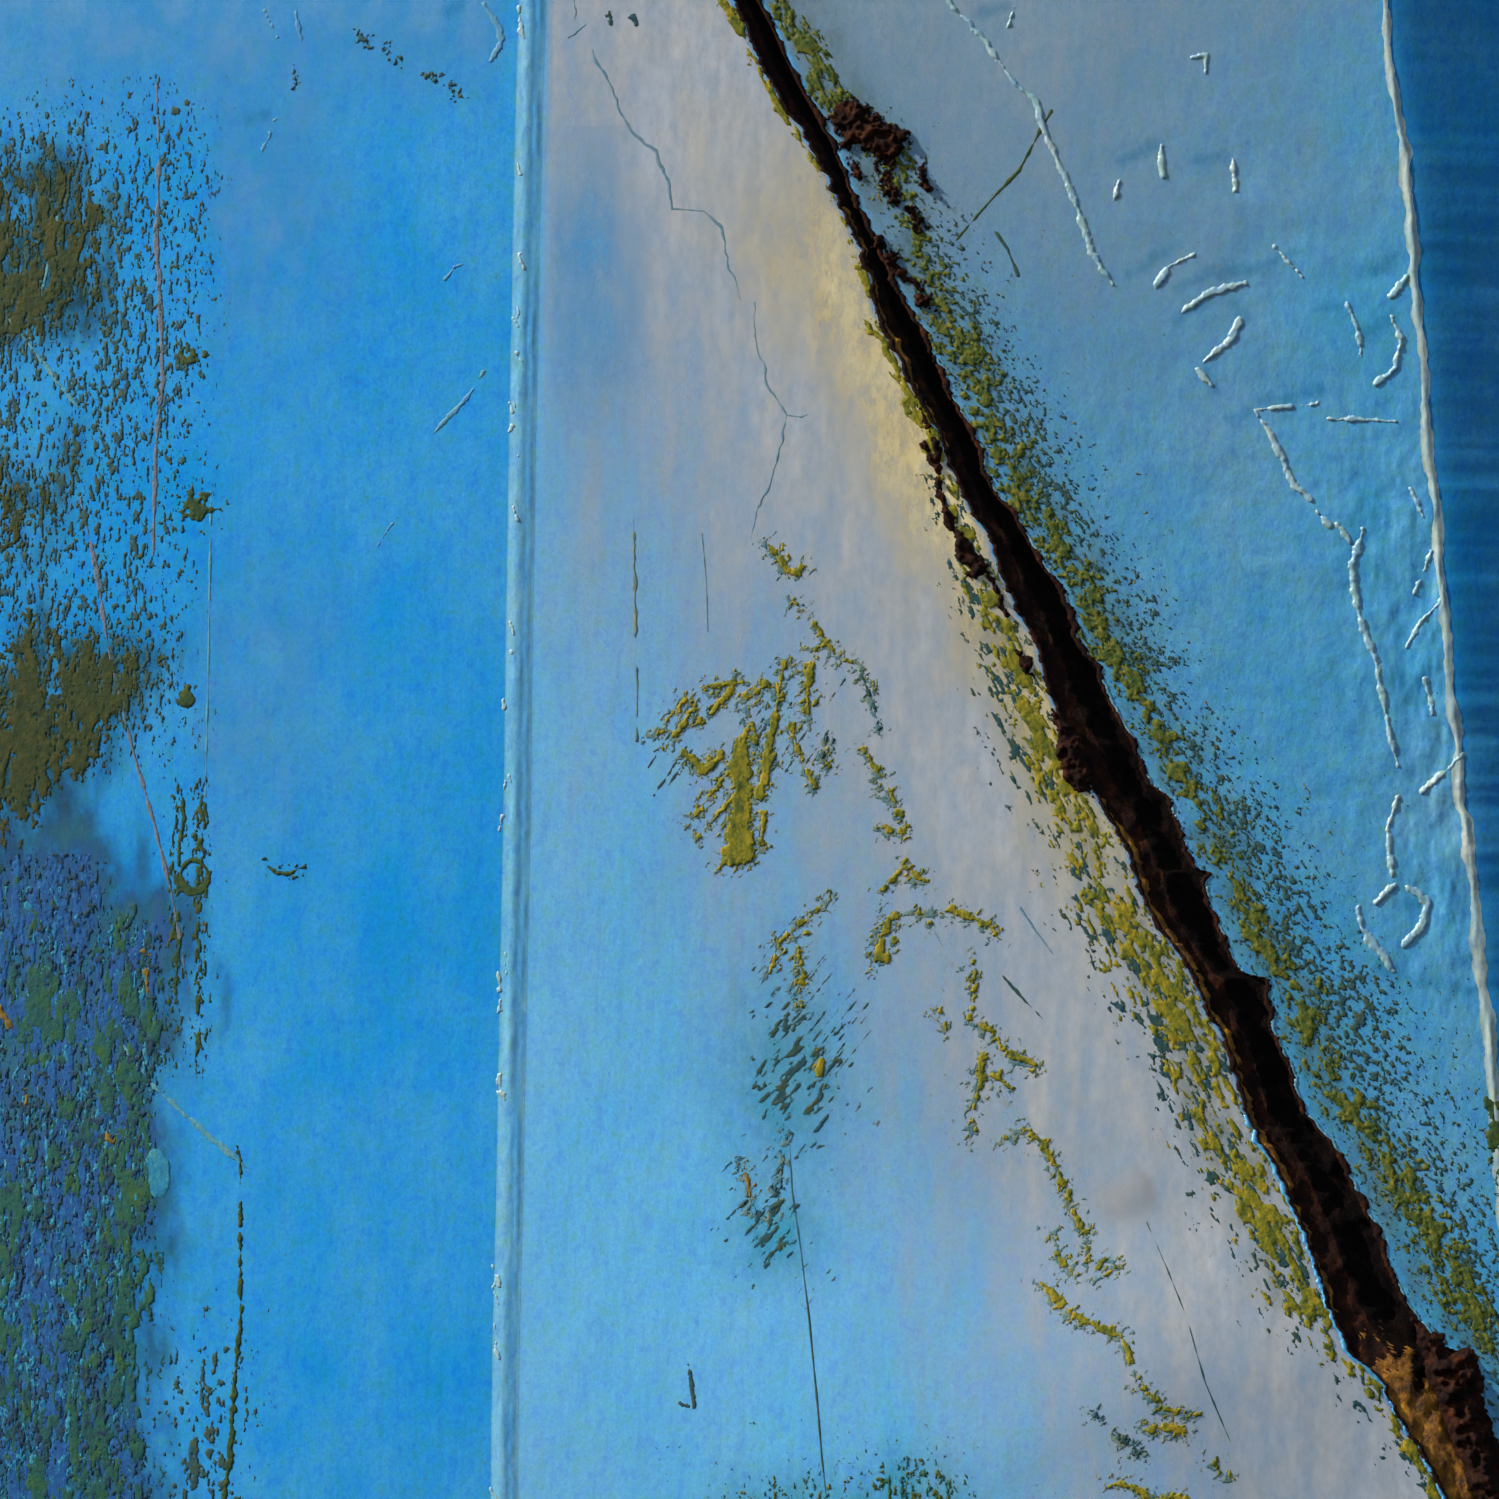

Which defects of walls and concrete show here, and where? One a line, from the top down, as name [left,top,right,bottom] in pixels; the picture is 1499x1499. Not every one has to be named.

peeling [0,148,120,364]
crack [567,0,809,535]
corrosion [823,94,934,235]
peeling [0,405,89,571]
peeling [550,0,1442,1499]
crack [734,0,1499,1499]
corrosion [1410,1317,1499,1499]